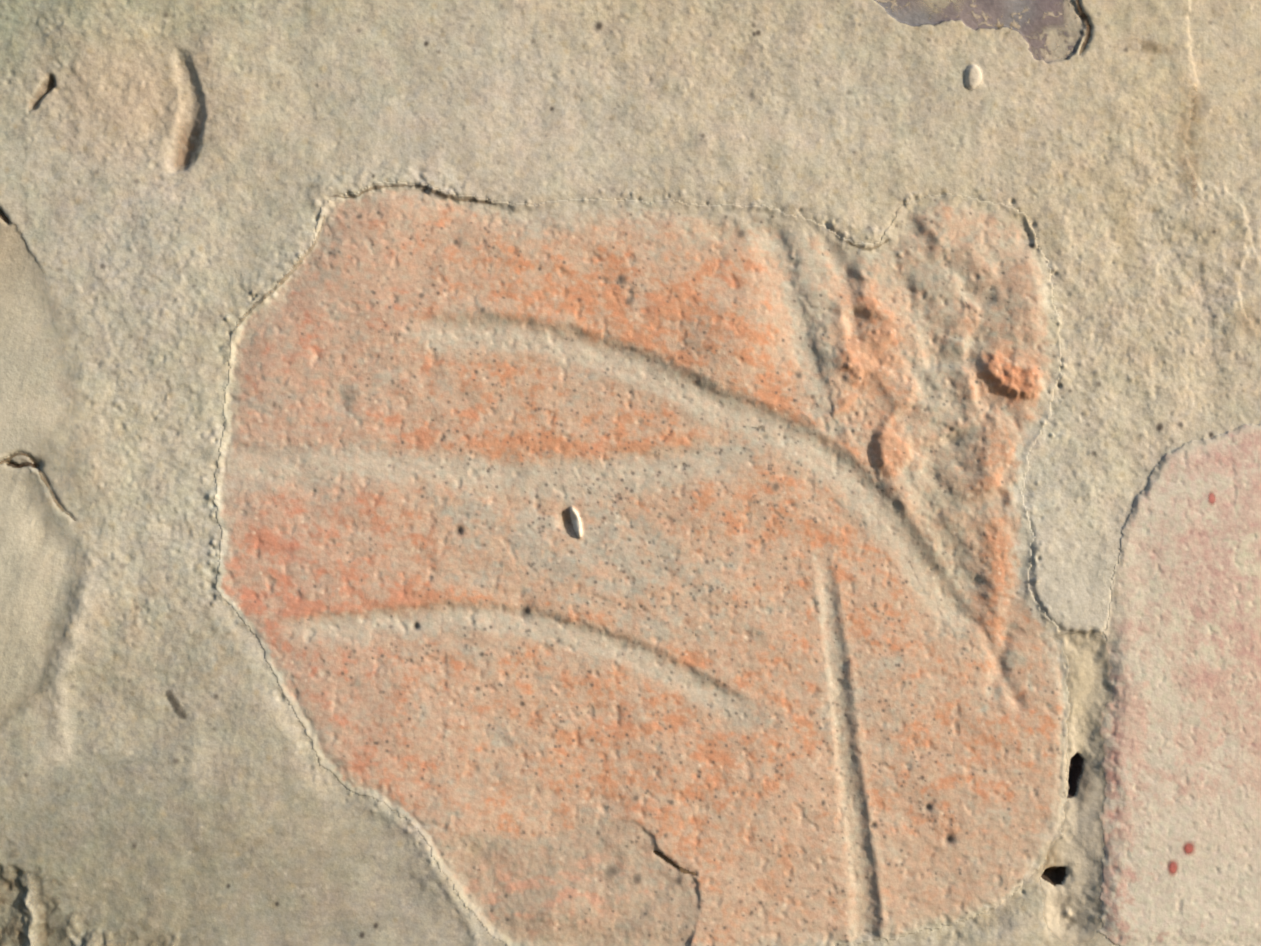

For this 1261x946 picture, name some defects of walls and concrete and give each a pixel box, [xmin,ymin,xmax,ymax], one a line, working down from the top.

peeling [875,0,1085,63]
peeling [0,218,77,490]
spalling [0,866,132,946]